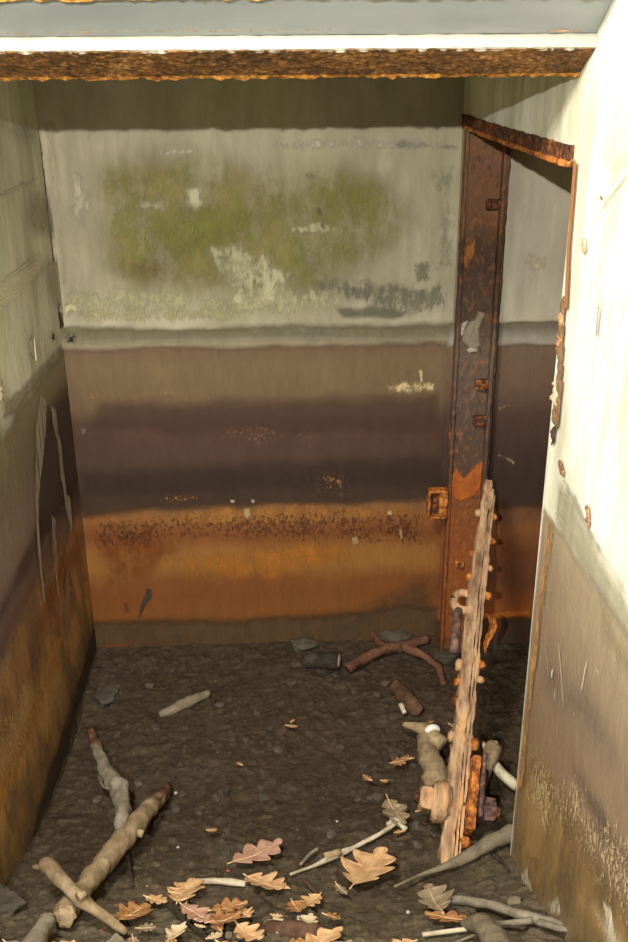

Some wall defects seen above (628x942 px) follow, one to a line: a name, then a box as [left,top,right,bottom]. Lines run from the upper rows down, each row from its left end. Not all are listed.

corrosion [0,72,580,82]
corrosion [463,240,476,268]
corrosion [564,161,586,309]
corrosion [451,461,482,501]
corrosion [0,500,445,887]
corrosion [483,506,628,942]